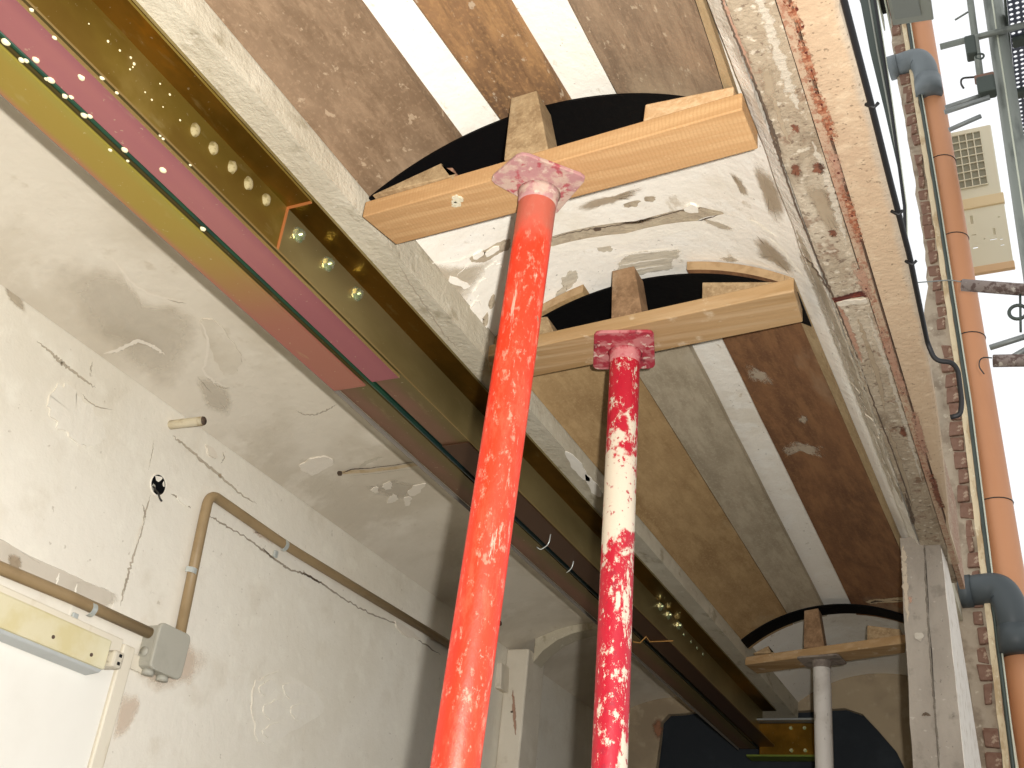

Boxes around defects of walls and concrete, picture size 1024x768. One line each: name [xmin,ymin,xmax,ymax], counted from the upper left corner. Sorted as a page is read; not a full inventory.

crack [550,203,724,252]
peeling [449,261,503,328]
peeling [556,271,578,297]
peeling [597,246,679,275]
peeling [103,339,165,355]
crack [38,342,112,410]
crack [148,436,252,502]
peeling [370,481,426,506]
crack [121,494,438,653]